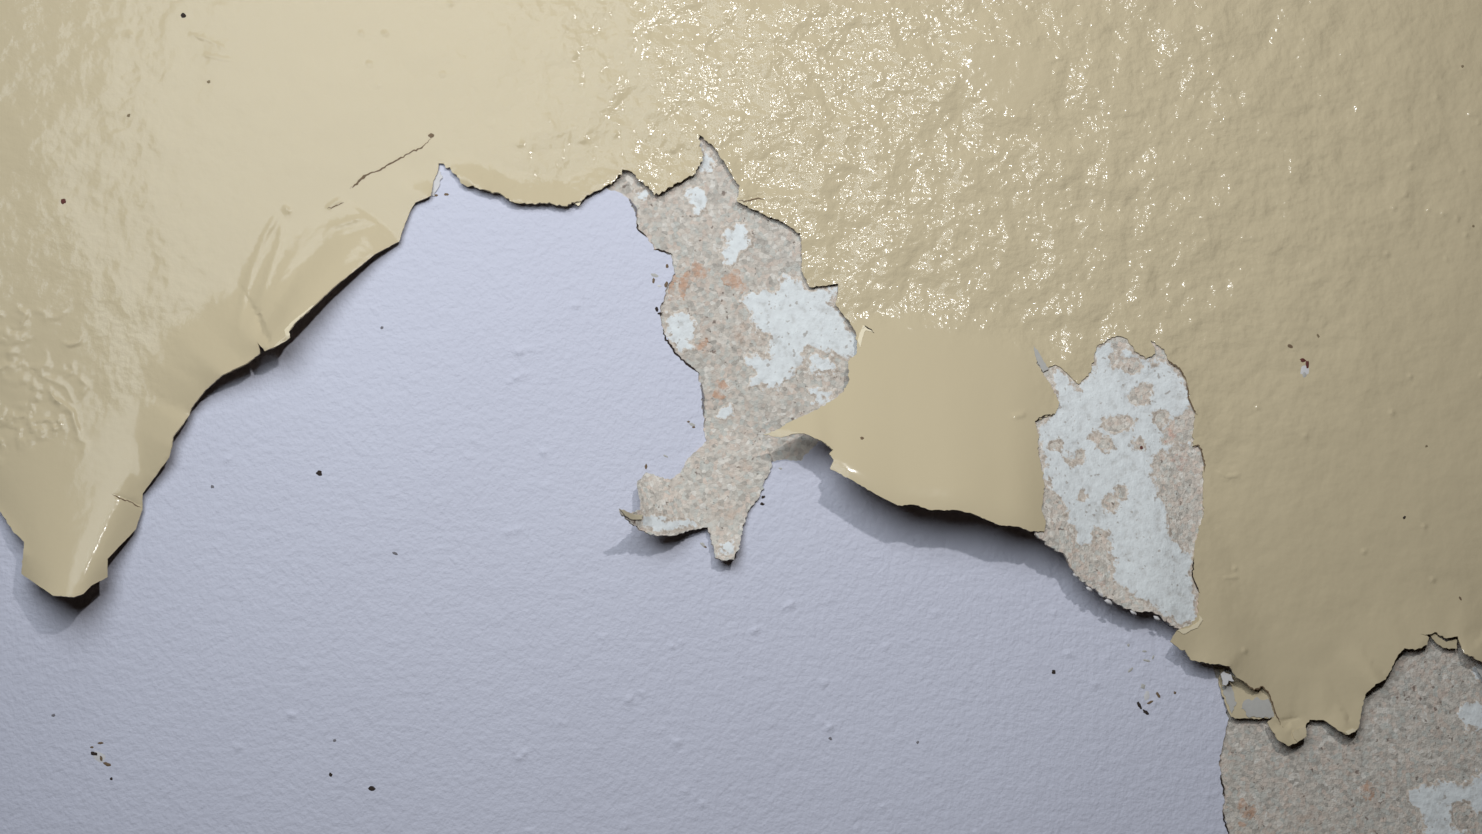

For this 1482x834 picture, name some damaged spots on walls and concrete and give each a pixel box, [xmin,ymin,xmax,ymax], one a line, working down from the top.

peeling [90,742,113,780]
crack [327,139,430,209]
flaking render [0,112,857,598]
peeling [763,261,1482,834]